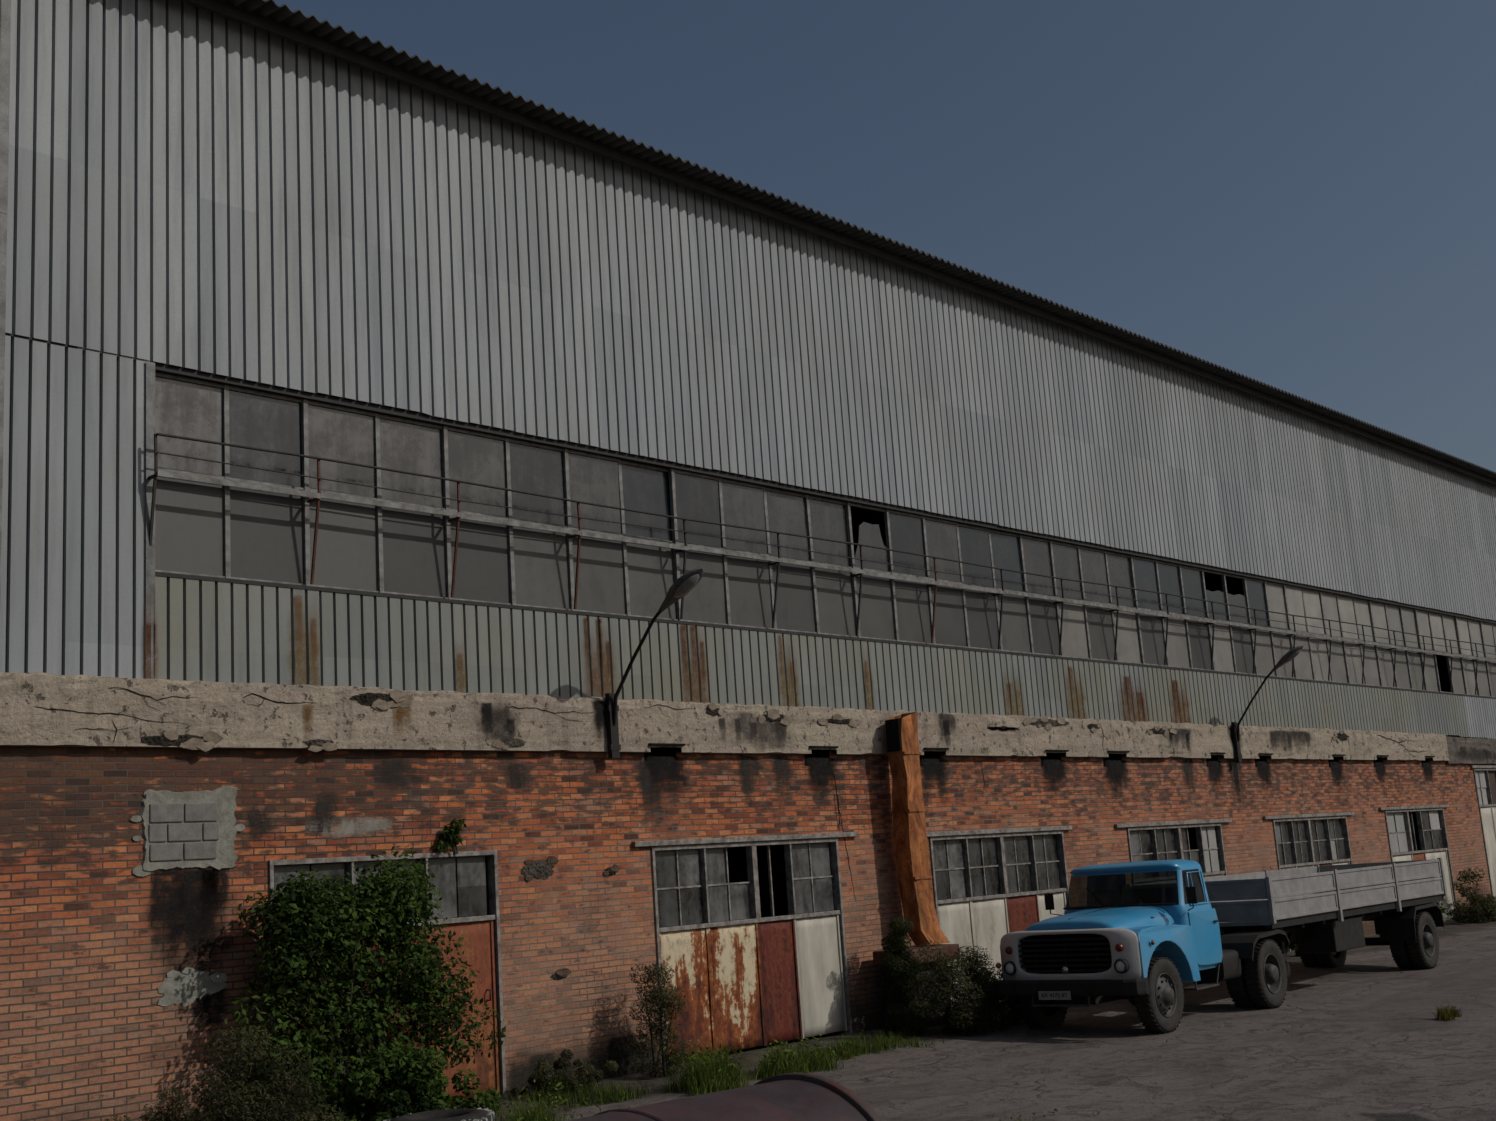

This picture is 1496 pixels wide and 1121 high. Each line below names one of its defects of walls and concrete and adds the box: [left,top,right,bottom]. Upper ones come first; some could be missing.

rust [584,618,612,697]
crack [34,687,198,744]
crack [243,693,312,707]
damp [482,703,514,739]
rust [1123,677,1147,722]
spalling [492,736,526,749]
spalling [521,856,559,881]
damp [152,869,229,936]
peeling [166,967,228,994]